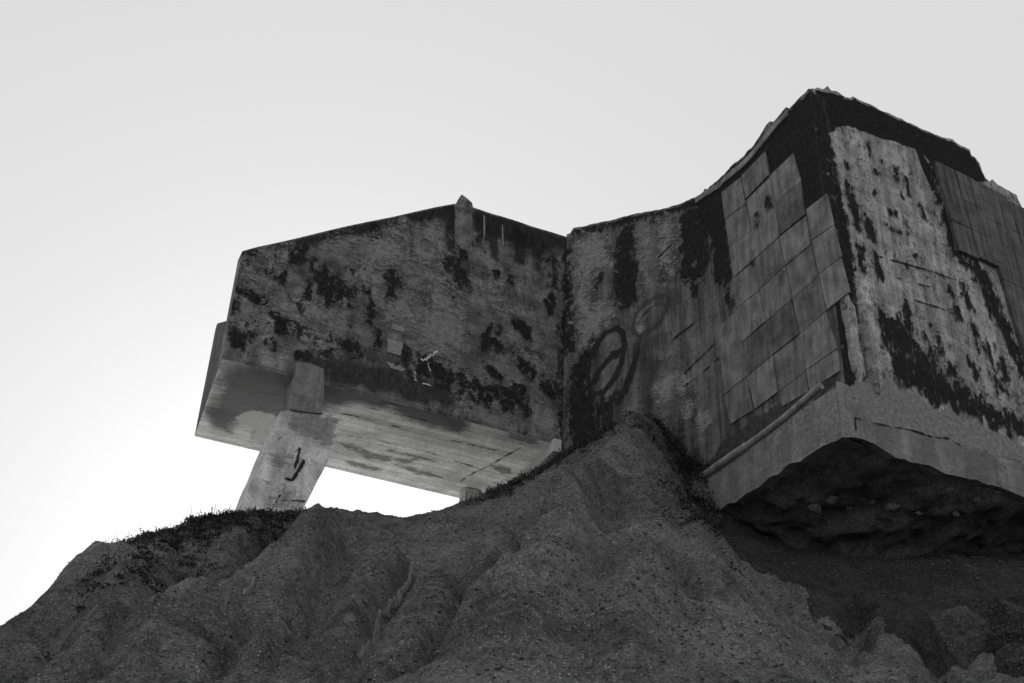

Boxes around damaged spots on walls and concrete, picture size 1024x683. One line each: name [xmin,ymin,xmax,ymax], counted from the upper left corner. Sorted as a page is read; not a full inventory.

leakage [471,199,698,447]
leakage [207,353,467,445]
crack [854,417,960,445]